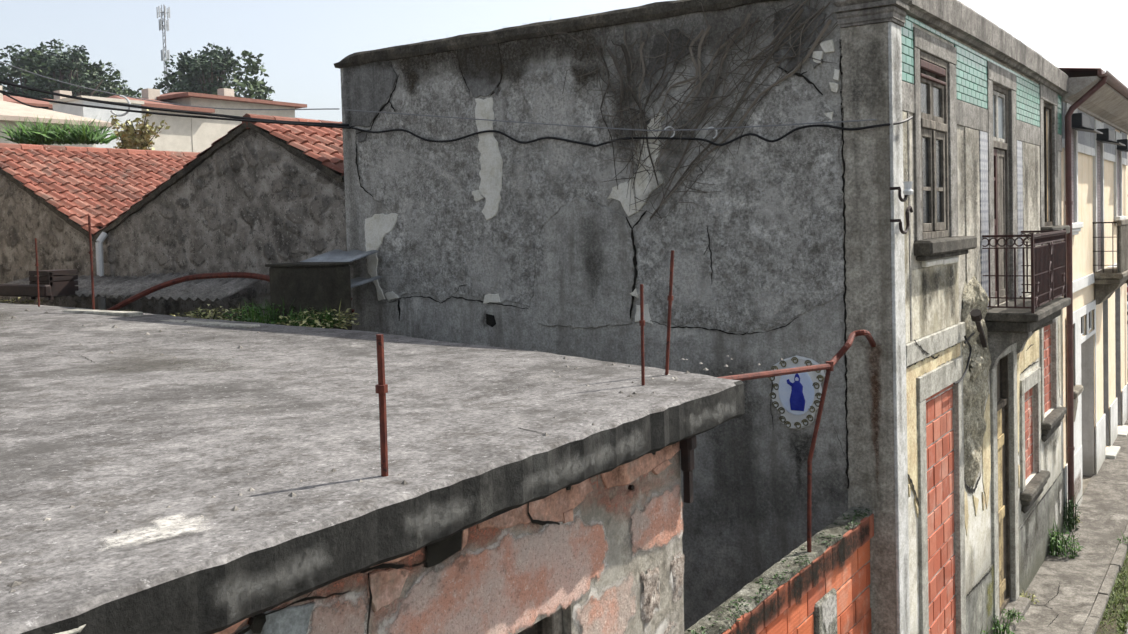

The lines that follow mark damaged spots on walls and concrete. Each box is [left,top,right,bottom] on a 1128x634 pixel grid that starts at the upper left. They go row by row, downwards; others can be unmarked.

crack [458,52,502,96]
crack [355,74,400,197]
spalling [341,29,844,333]
crack [389,285,528,321]
crack [626,210,798,335]
crack [777,39,849,489]
spalling [906,275,992,536]
crack [527,503,560,526]
crack [238,560,427,634]
water stain [794,562,819,604]
water stain [822,596,837,632]